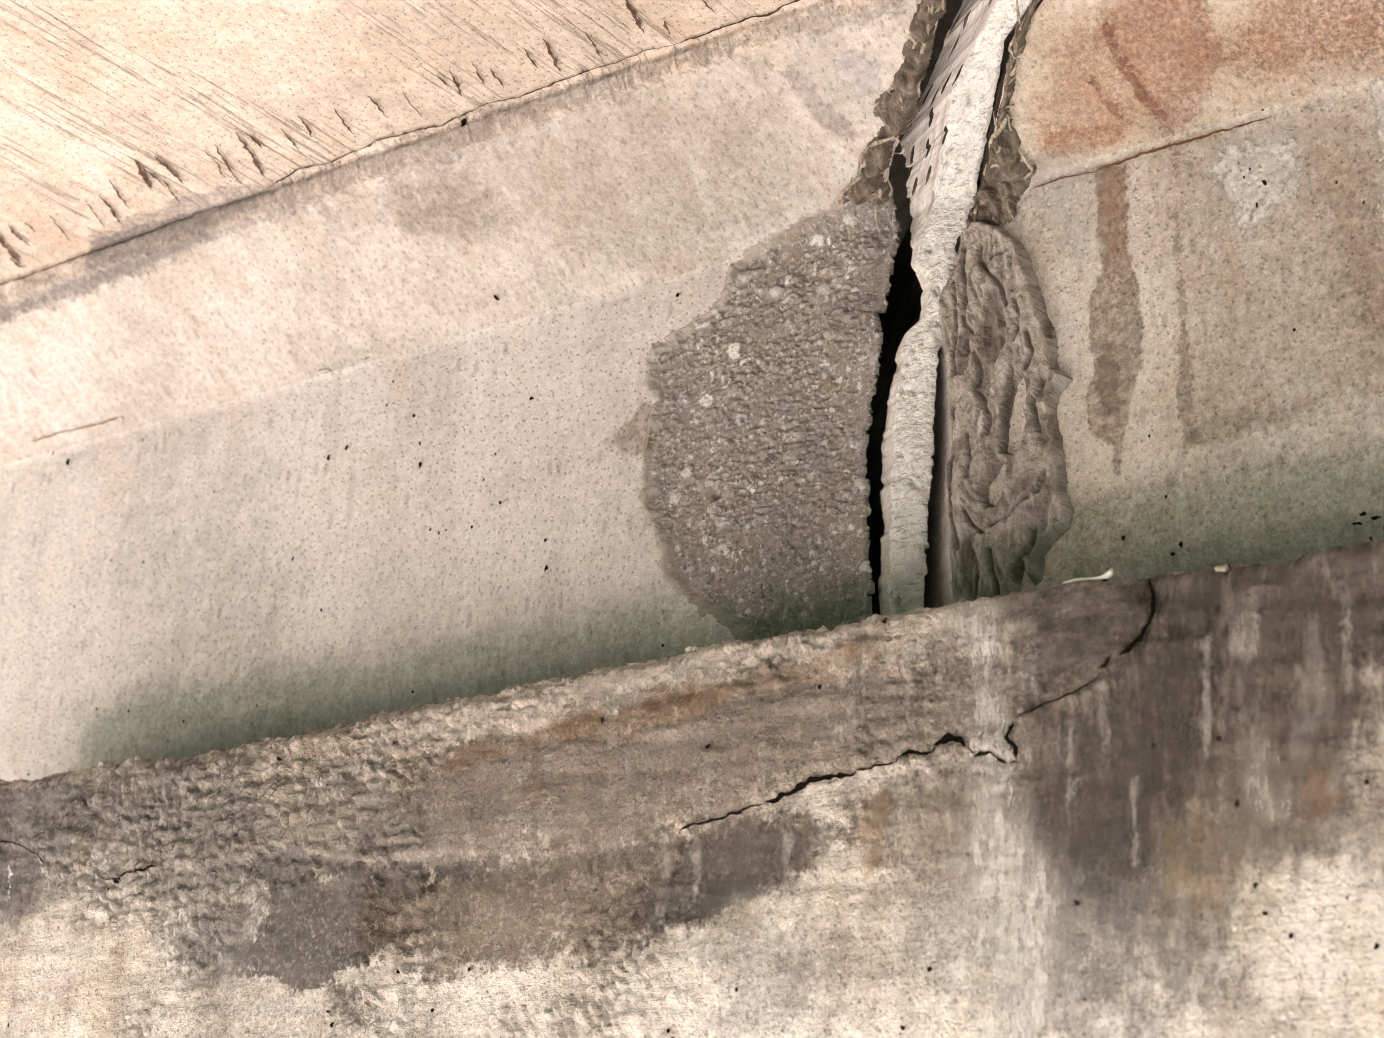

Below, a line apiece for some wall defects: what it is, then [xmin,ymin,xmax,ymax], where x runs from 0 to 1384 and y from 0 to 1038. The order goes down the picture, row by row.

crack [0,0,800,285]
corrosion [1094,0,1384,129]
spalling [638,190,901,641]
peeling [939,222,1074,603]
water stain [1034,160,1143,473]
water stain [0,541,1384,1038]
crack [679,577,1156,833]